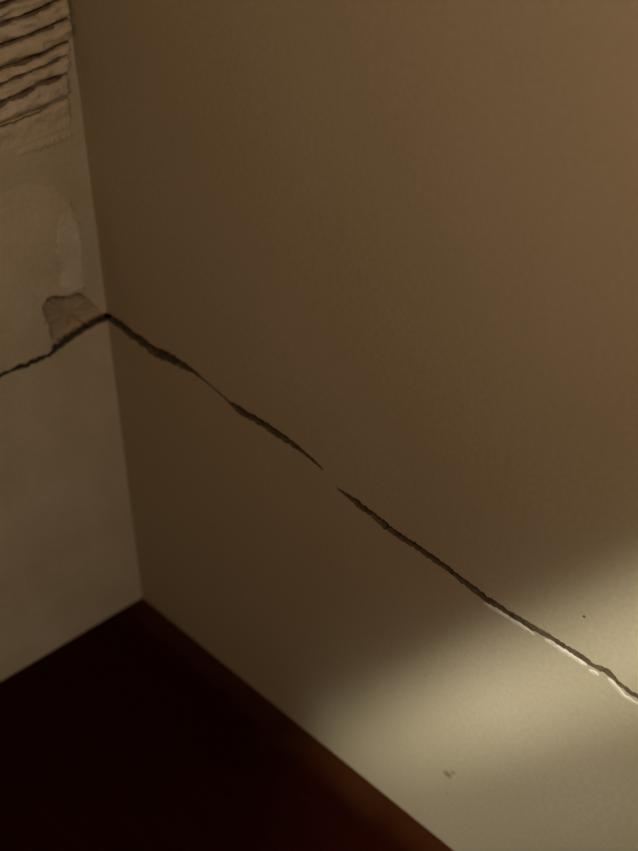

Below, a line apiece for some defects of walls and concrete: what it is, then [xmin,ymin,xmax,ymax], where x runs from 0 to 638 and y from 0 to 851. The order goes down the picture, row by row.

crack [0,313,323,470]
crack [337,488,638,705]